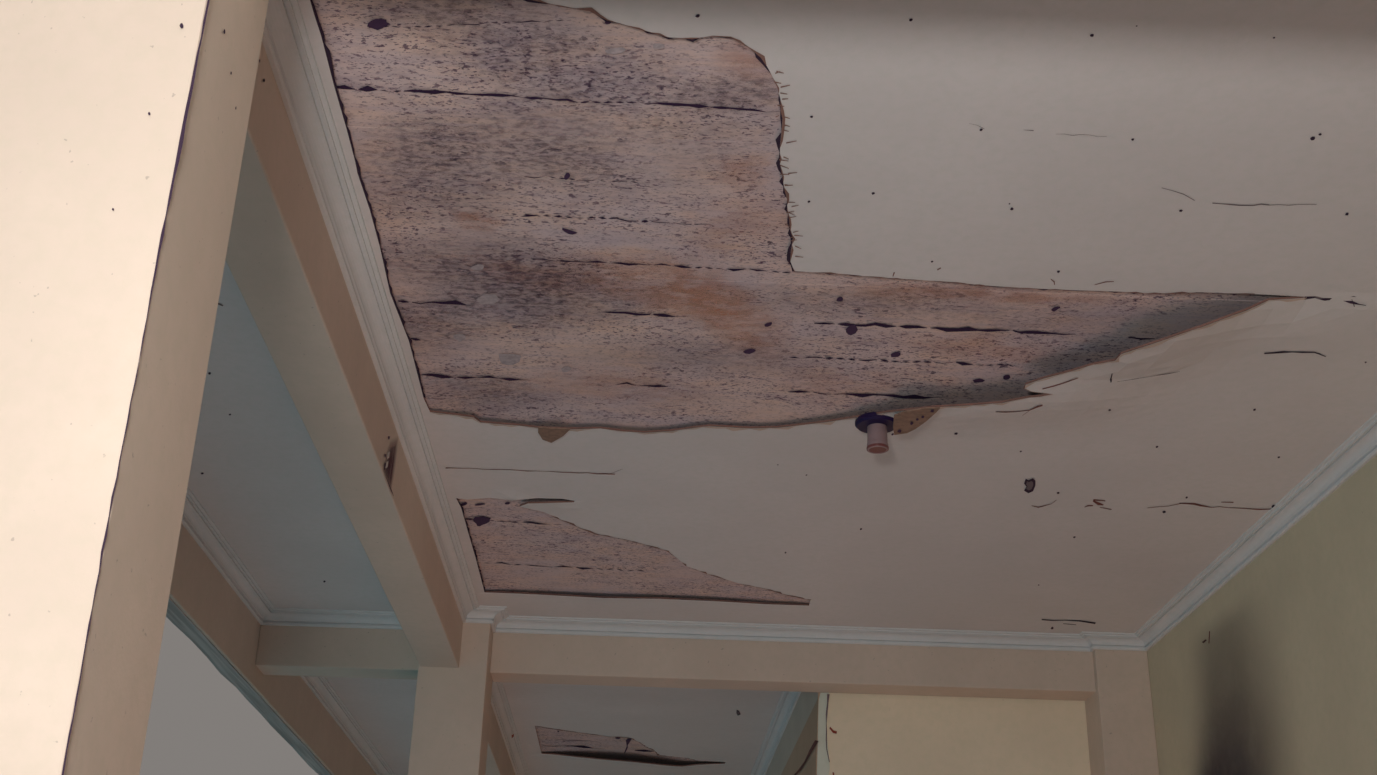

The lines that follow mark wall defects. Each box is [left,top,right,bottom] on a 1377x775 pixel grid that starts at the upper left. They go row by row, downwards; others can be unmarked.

peeling [310,0,1307,443]
peeling [457,498,810,605]
peeling [535,726,725,766]